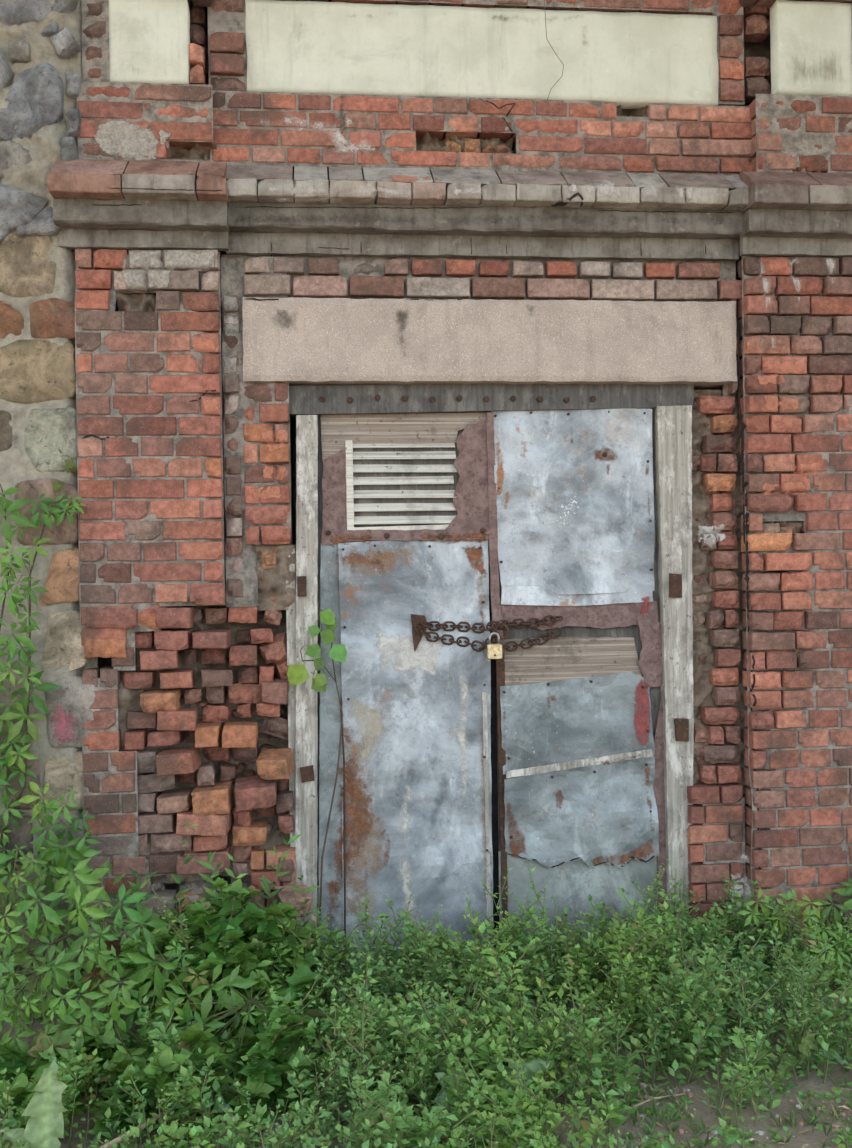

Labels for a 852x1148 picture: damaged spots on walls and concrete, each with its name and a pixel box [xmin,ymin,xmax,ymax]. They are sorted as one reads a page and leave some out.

spalling [416,132,514,154]
spalling [757,374,799,412]
rust [497,443,509,506]
rust [595,448,617,473]
spalling [760,463,817,495]
rust [330,535,409,573]
rust [422,533,486,581]
spalling [692,389,804,794]
rust [328,729,390,921]
rust [507,804,525,857]
rust [593,829,654,865]